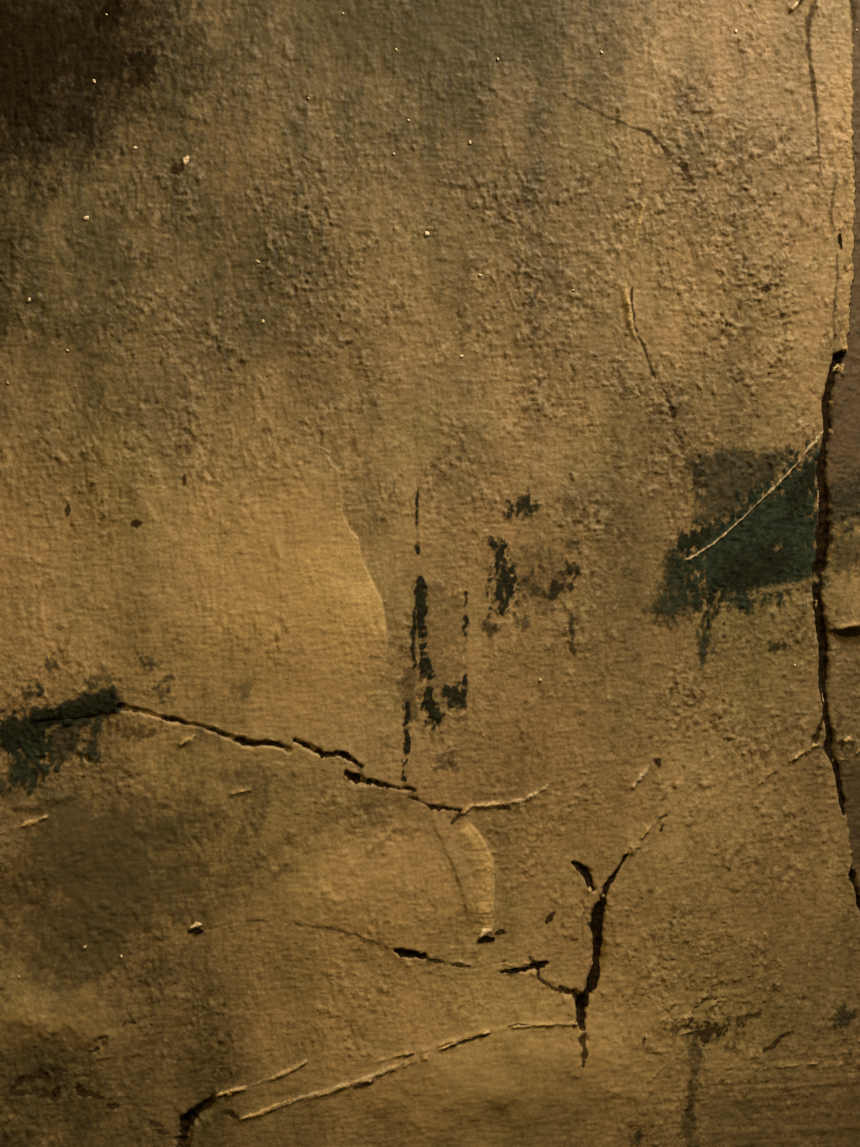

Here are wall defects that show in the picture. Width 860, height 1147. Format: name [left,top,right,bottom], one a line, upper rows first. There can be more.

crack [806,0,819,153]
crack [564,94,696,186]
damp [654,0,860,666]
damp [504,494,539,519]
damp [486,536,516,615]
damp [549,561,580,599]
crack [812,351,845,815]
damp [401,575,468,782]
damp [0,682,124,794]
crack [162,716,548,824]
crack [848,870,860,909]
crack [150,813,668,1147]